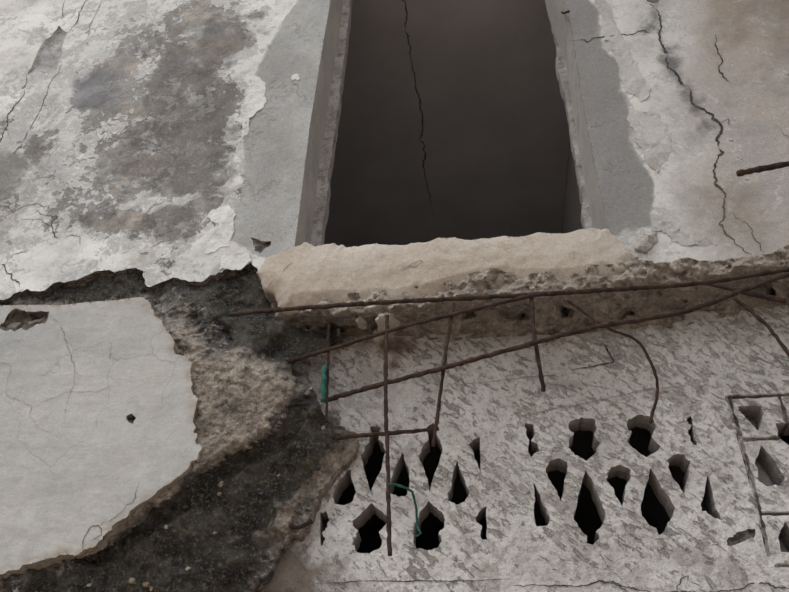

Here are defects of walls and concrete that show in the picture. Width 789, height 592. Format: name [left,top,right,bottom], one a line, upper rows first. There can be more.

crack [0,72,59,156]
water stain [72,72,114,107]
peeling [240,75,266,141]
peeling [595,0,672,172]
crack [563,1,761,253]
spalling [736,161,789,177]
crack [3,203,77,238]
peeling [203,205,271,271]
spalling [0,308,49,331]
spalling [228,267,789,556]
crack [312,579,650,592]
crack [716,582,789,592]